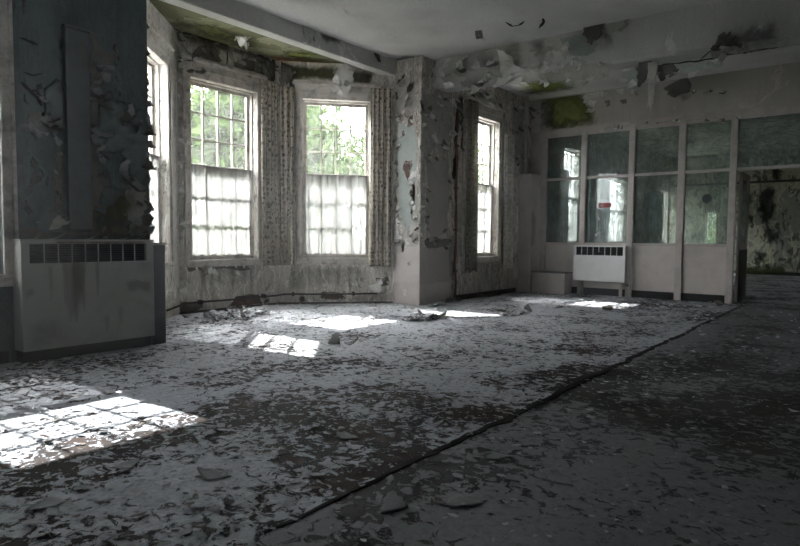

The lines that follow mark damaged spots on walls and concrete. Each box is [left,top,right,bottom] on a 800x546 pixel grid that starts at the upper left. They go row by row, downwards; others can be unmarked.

peeling [192,45,223,65]
leakage [177,23,259,58]
peeling [234,35,256,77]
peeling [656,31,745,82]
peeling [142,39,154,128]
peeling [392,30,638,251]
peeling [120,157,168,245]
leakage [749,187,777,243]
flaking render [229,292,265,307]
peeling [197,466,231,481]